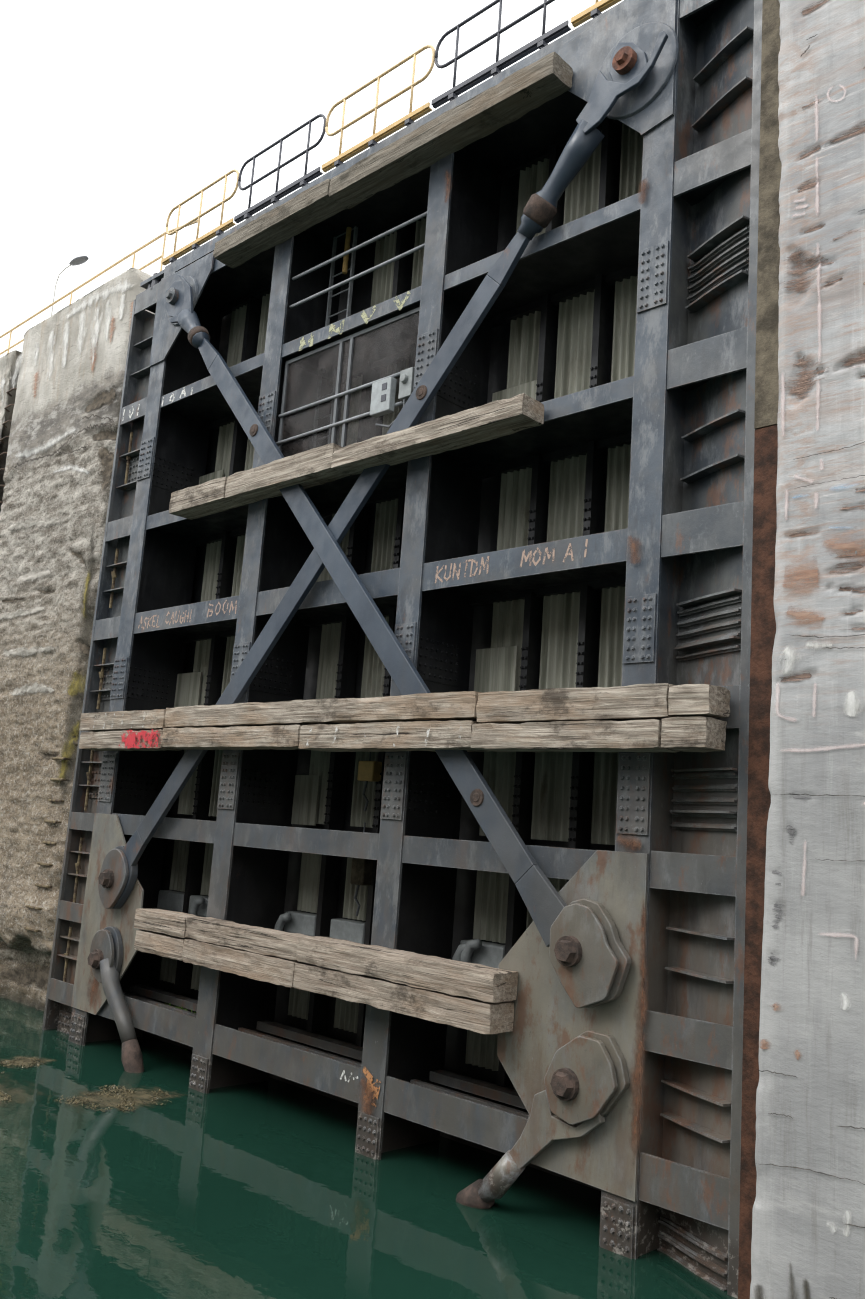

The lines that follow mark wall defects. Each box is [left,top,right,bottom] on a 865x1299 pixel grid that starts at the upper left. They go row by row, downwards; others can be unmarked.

corrosion [361,1067,381,1113]